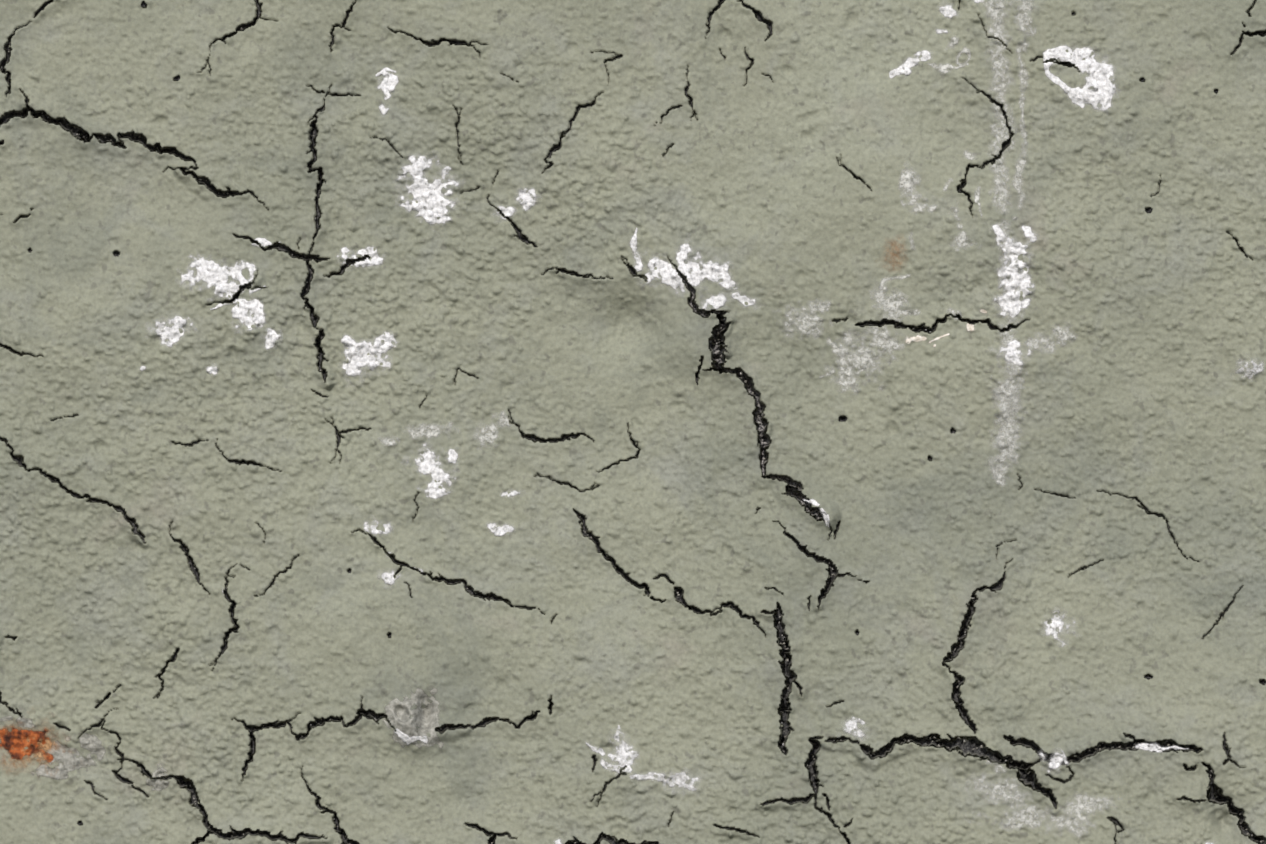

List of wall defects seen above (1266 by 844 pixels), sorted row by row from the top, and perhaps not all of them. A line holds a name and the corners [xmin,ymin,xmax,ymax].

crack [0,0,263,203]
damp [889,5,971,78]
damp [181,255,281,349]
crack [213,85,370,464]
damp [398,156,459,224]
damp [630,228,755,309]
damp [974,0,1076,484]
crack [0,438,299,666]
crack [508,258,1266,844]
corrosion [0,727,55,764]
crack [53,684,357,844]
crack [237,700,394,781]